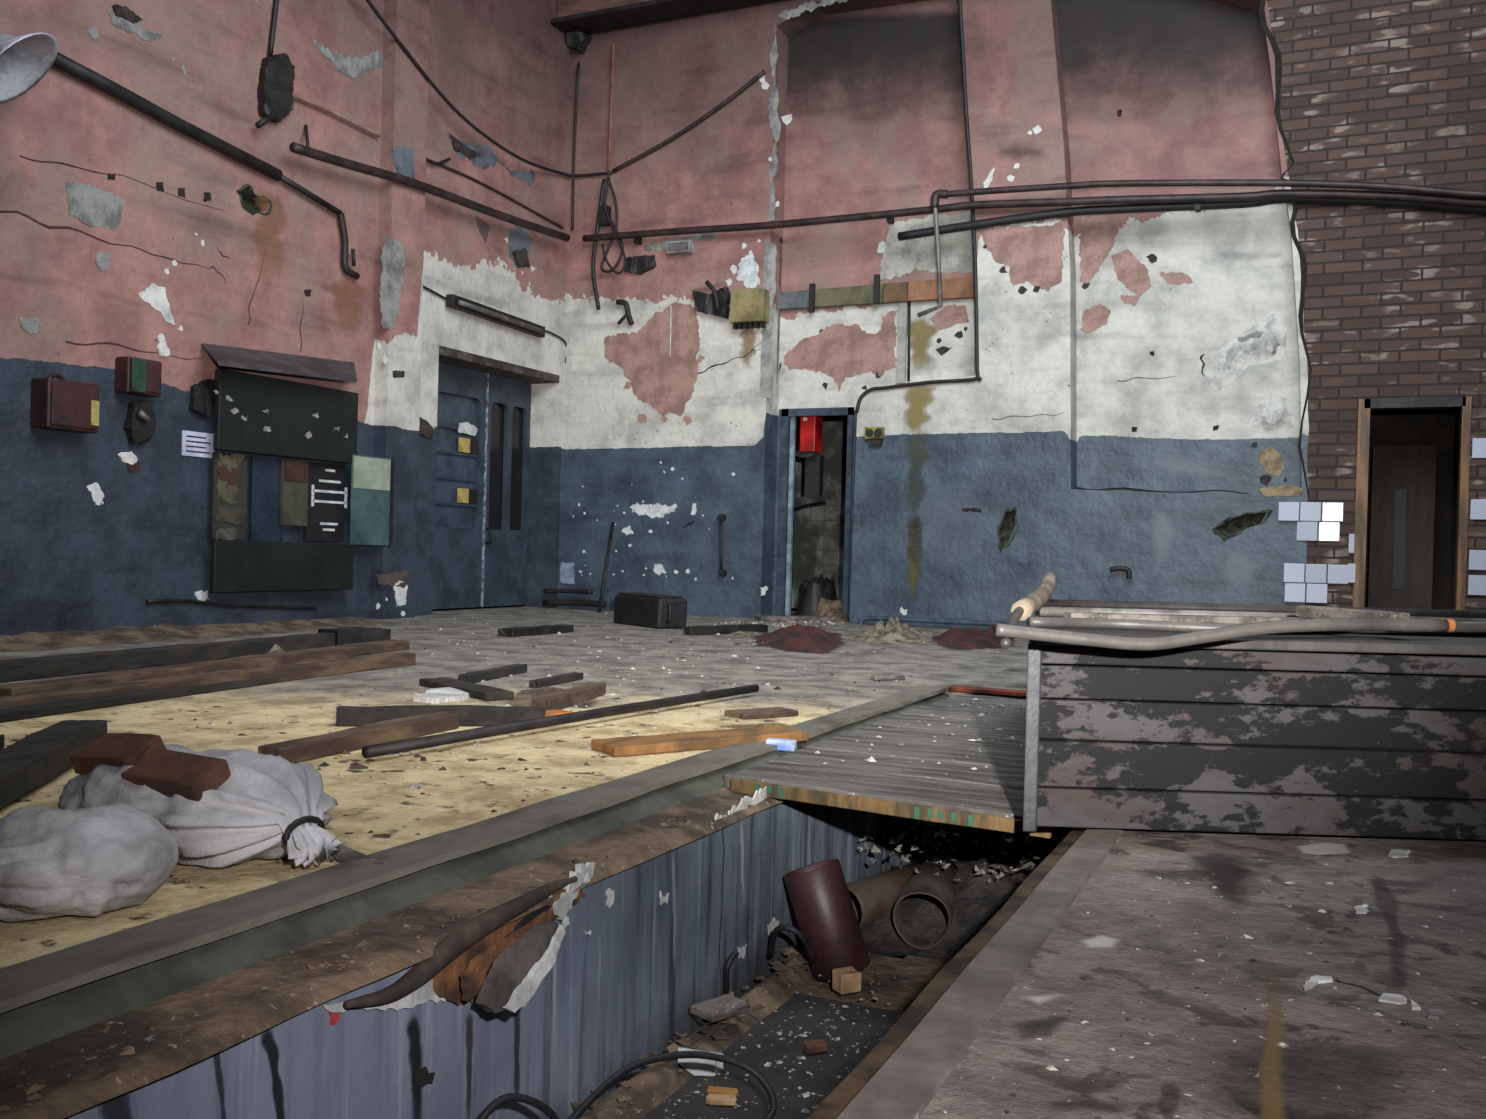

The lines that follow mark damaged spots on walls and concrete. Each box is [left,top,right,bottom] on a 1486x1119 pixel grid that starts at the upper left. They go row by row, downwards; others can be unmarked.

crack [20,155,224,211]
crack [0,210,267,325]
peeling [138,260,183,356]
peeling [377,236,406,378]
peeling [877,210,1194,333]
peeling [604,302,705,425]
peeling [573,486,710,552]
spalling [125,786,969,1119]
water stain [102,1093,130,1119]
water stain [214,1052,226,1119]
water stain [262,1030,284,1119]
water stain [408,1019,421,1119]